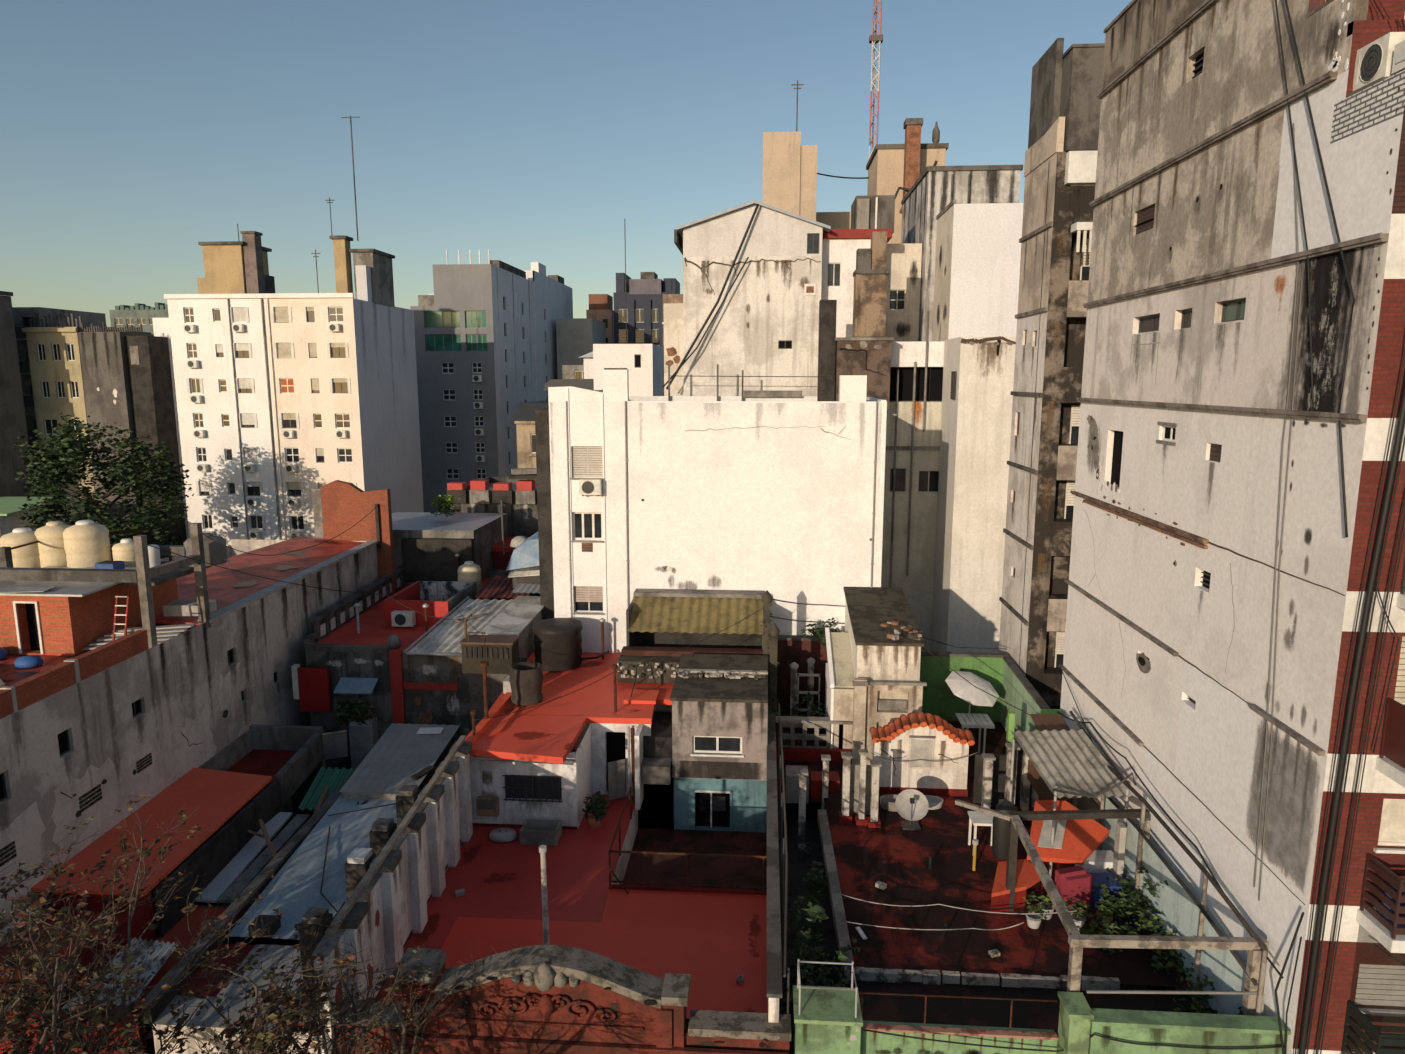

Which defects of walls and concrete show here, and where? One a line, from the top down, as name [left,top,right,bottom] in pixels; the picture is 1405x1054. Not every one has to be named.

damp [1111,0,1169,57]
damp [1119,22,1193,107]
damp [1278,2,1339,64]
damp [1104,163,1178,241]
crack [684,257,821,295]
damp [1285,245,1374,427]
crack [685,426,851,440]
damp [1247,719,1319,889]